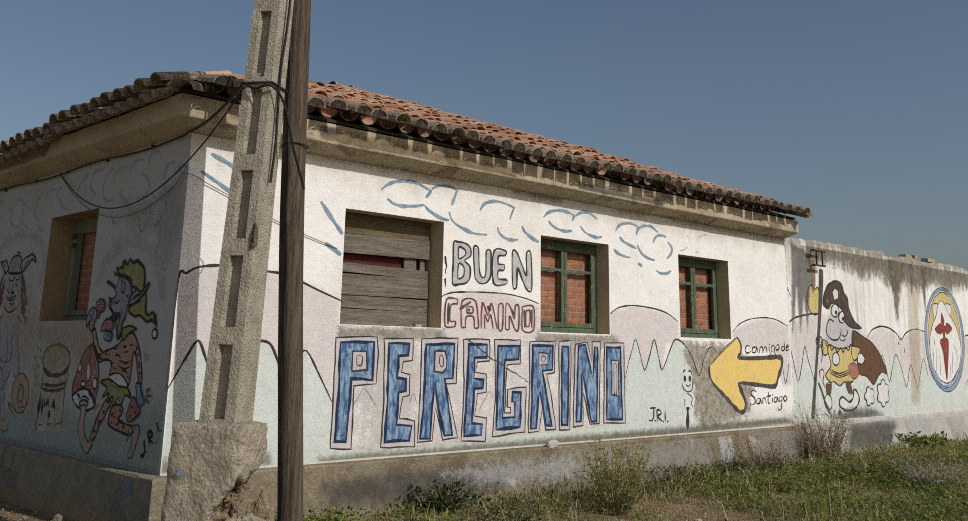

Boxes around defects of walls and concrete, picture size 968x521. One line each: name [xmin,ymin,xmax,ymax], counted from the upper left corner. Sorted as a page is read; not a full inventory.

damp [791,244,968,322]
spalling [210,474,252,521]